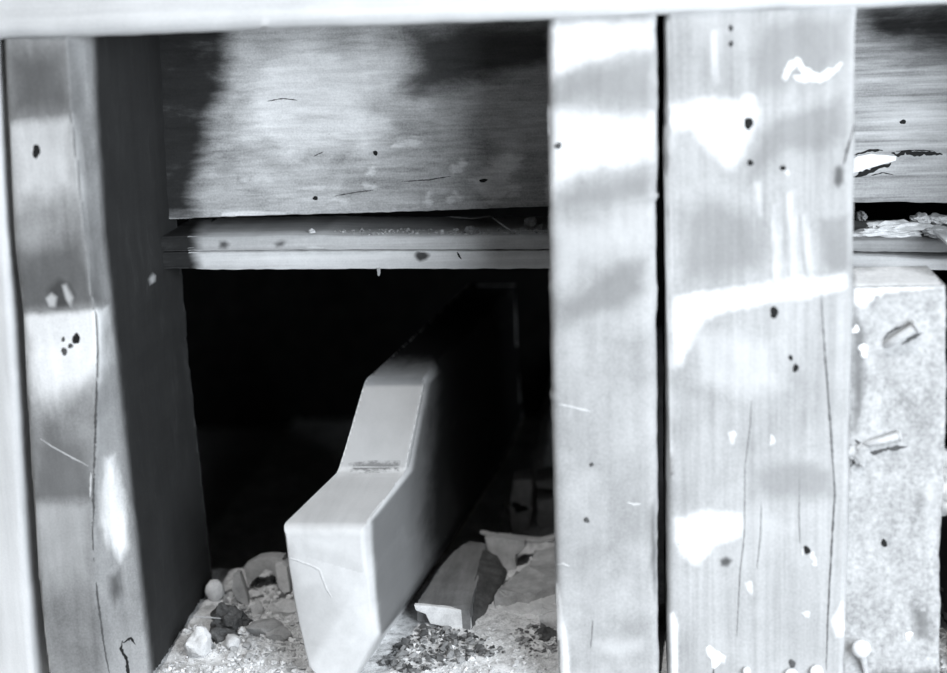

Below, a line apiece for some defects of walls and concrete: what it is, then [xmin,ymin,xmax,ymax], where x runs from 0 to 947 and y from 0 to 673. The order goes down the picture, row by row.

crack [843,124,942,178]
crack [92,350,136,673]
crack [737,400,762,631]
crack [795,483,803,542]
crack [821,295,907,671]